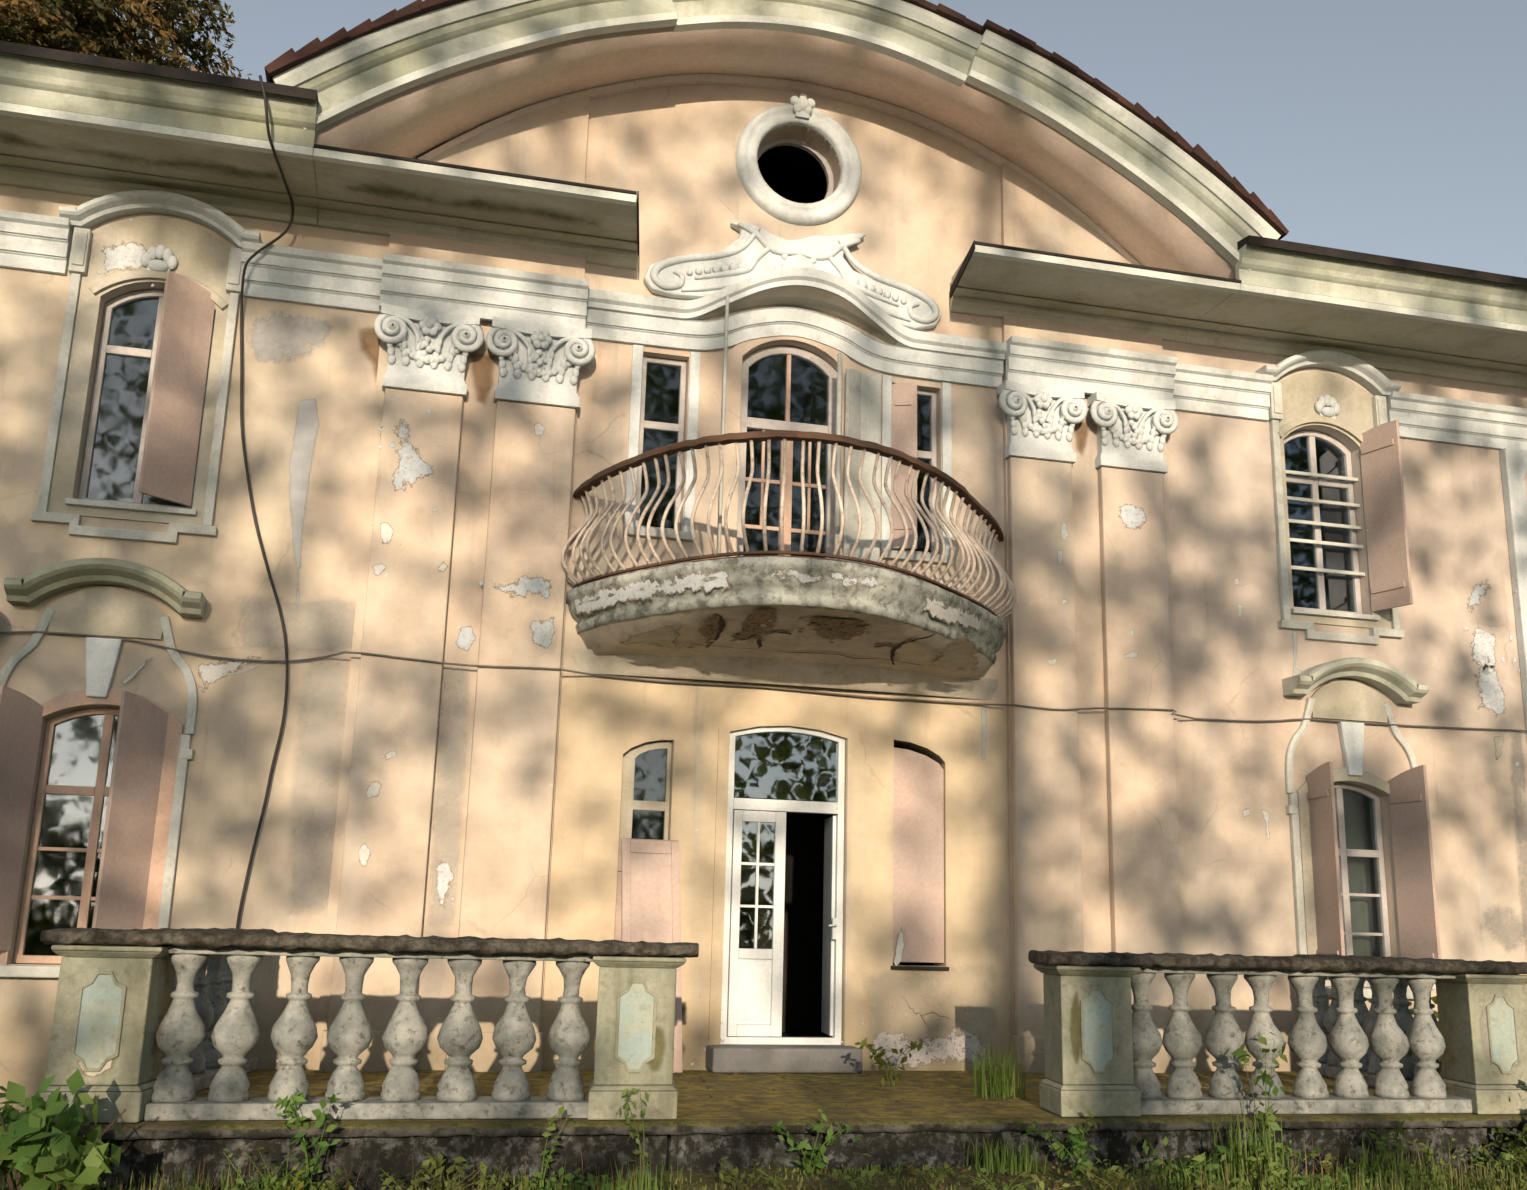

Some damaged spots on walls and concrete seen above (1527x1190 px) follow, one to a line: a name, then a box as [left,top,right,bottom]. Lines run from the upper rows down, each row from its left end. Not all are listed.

peeling [378,404,442,512]
peeling [1119,504,1151,530]
peeling [479,575,552,615]
peeling [530,616,554,648]
peeling [574,570,731,615]
spalling [687,609,777,651]
crack [661,614,935,665]
spalling [797,617,872,643]
peeling [922,597,981,631]
peeling [1464,579,1520,716]
peeling [861,1021,1009,1071]